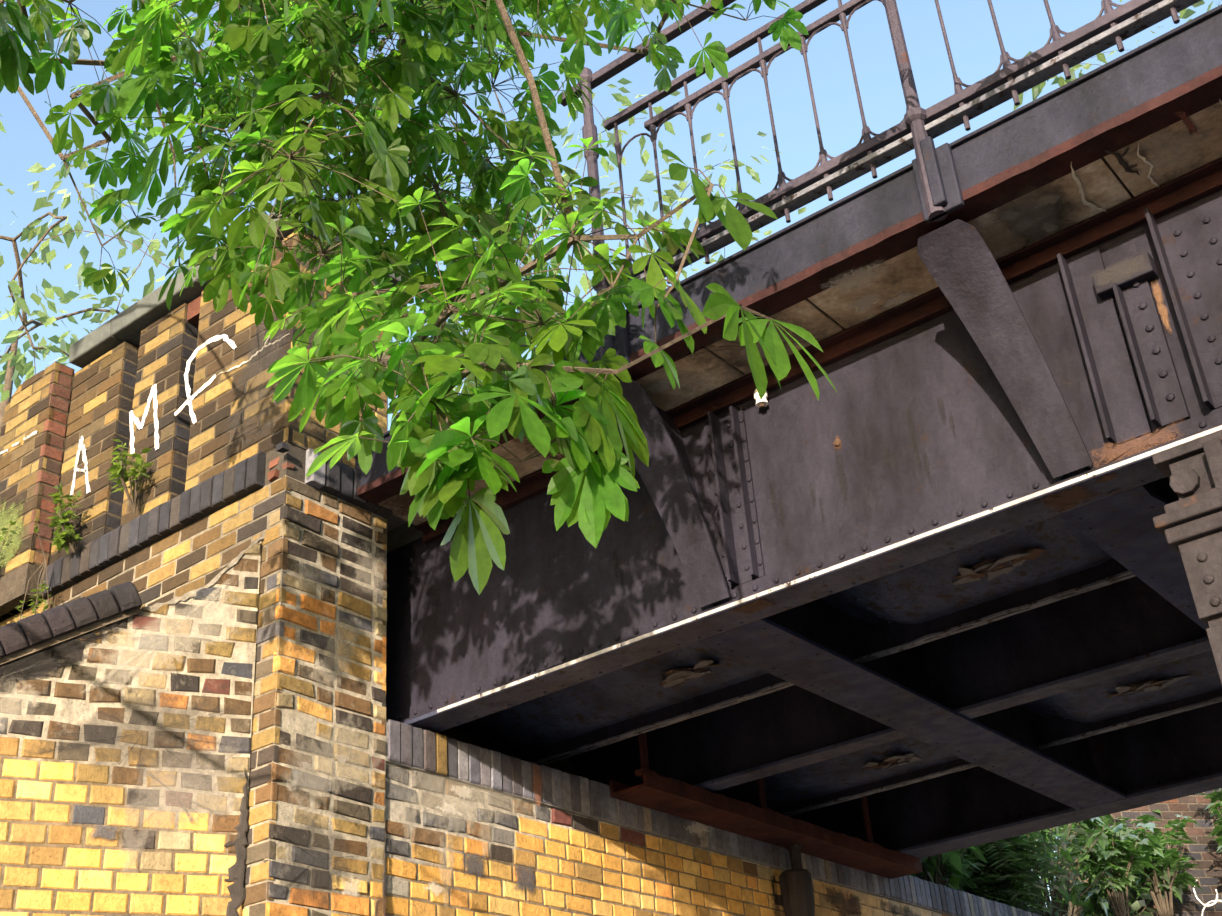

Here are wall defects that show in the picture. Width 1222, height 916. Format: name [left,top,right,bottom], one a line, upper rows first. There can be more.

crack [1071,162,1106,212]
crack [1105,144,1159,187]